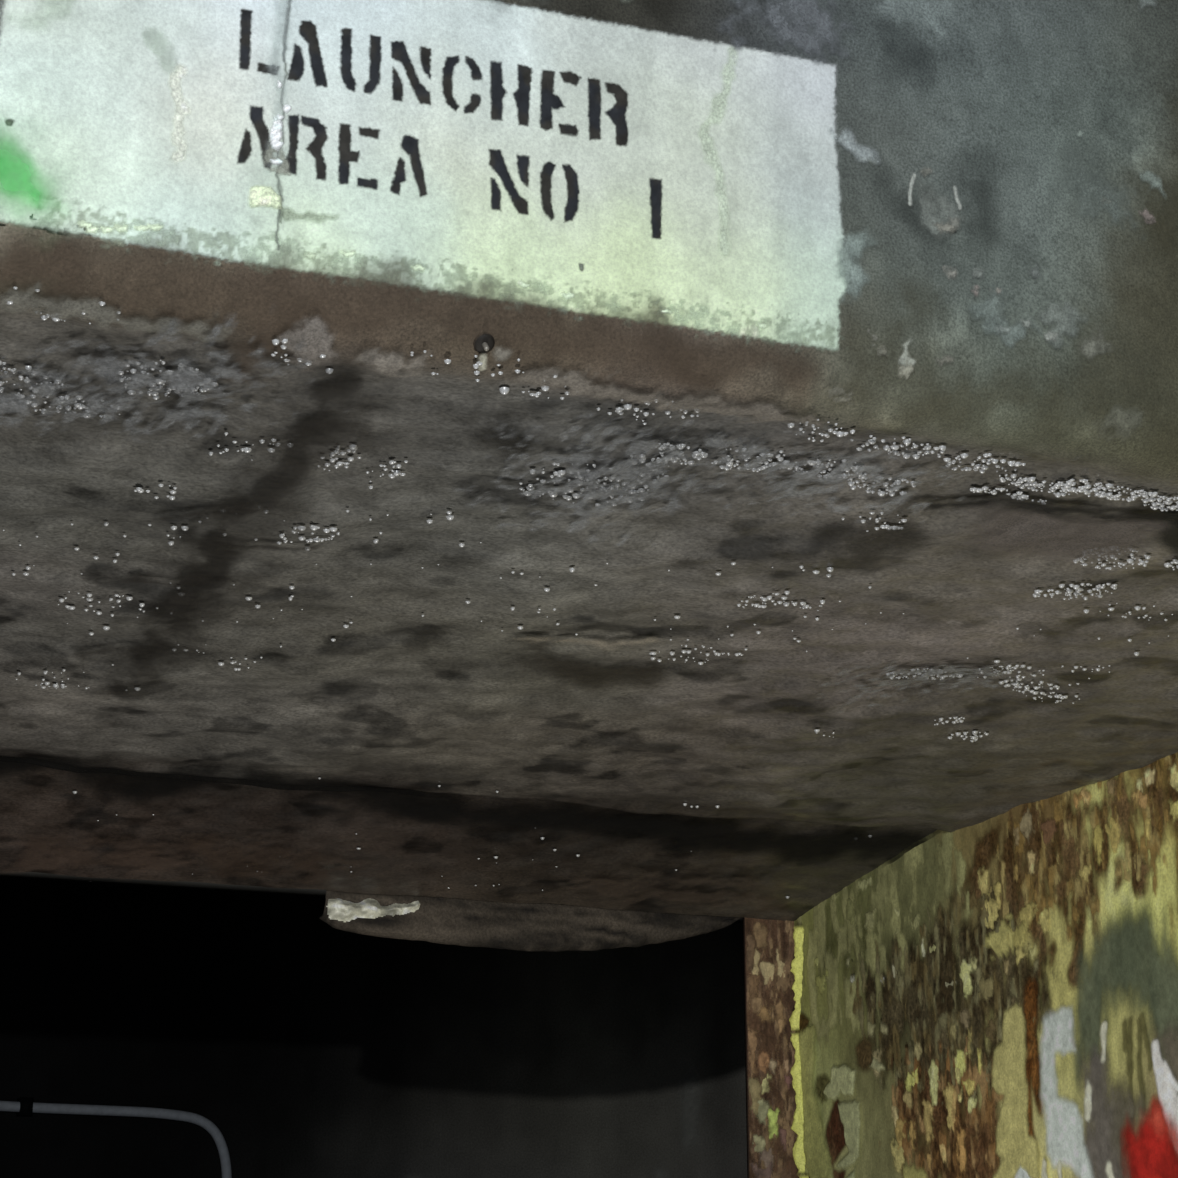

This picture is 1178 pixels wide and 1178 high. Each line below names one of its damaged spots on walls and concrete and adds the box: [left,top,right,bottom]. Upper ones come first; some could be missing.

crack [264,0,291,249]
water stain [0,288,263,433]
water stain [279,317,336,372]
water stain [357,350,424,377]
water stain [518,368,823,426]
water stain [495,414,928,532]
water stain [855,665,1001,706]
water stain [0,756,928,862]
peeling [746,832,972,1178]
peeling [992,1004,1039,1178]